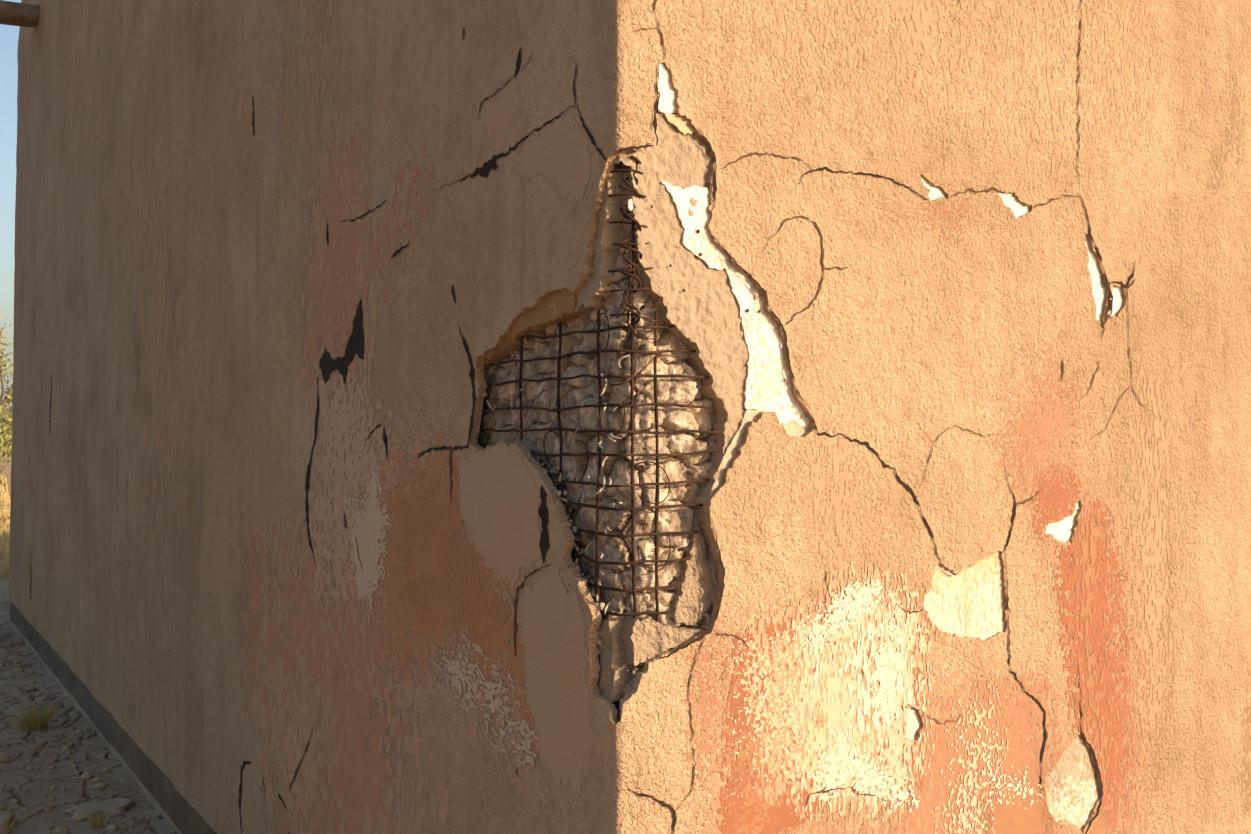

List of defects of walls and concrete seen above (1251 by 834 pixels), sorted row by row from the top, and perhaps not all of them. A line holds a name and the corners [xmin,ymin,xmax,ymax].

spalling [920,175,946,200]
spalling [996,191,1030,218]
crack [1035,0,1148,440]
spalling [1085,235,1123,327]
crack [305,377,319,563]
crack [364,285,475,502]
crack [617,519,749,834]
crack [699,129,1047,793]
damp [720,422,1098,834]
corrosion [669,342,1166,834]
spalling [924,553,1005,640]
spalling [1045,501,1080,542]